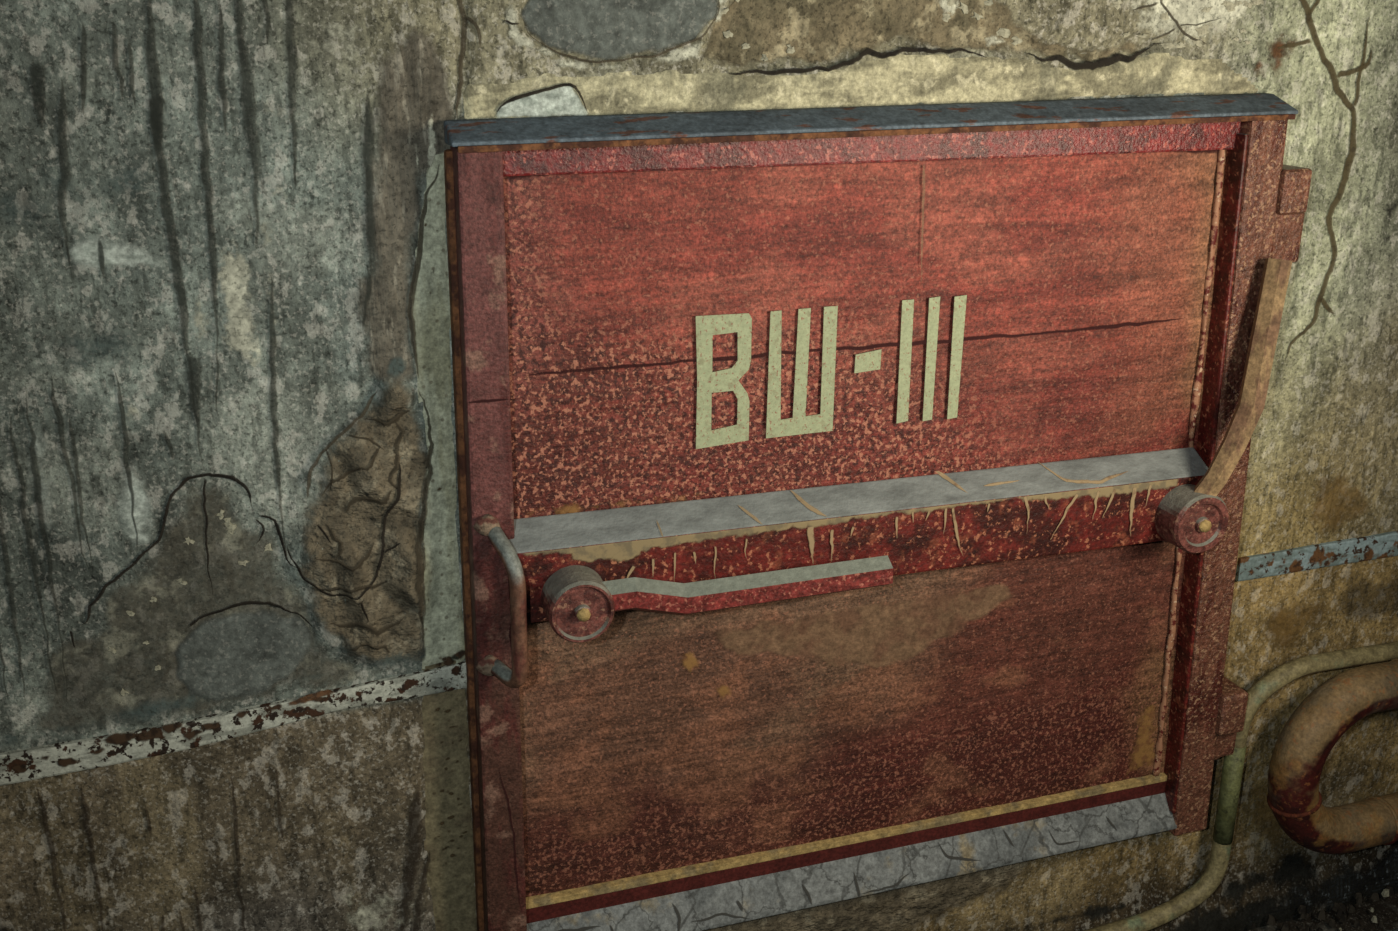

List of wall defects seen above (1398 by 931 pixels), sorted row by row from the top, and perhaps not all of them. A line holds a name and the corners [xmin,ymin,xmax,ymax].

flaking render [497,0,1264,118]
crack [1279,0,1372,359]
peeling [214,509,237,534]
crack [70,393,401,648]
flaking render [424,650,465,672]